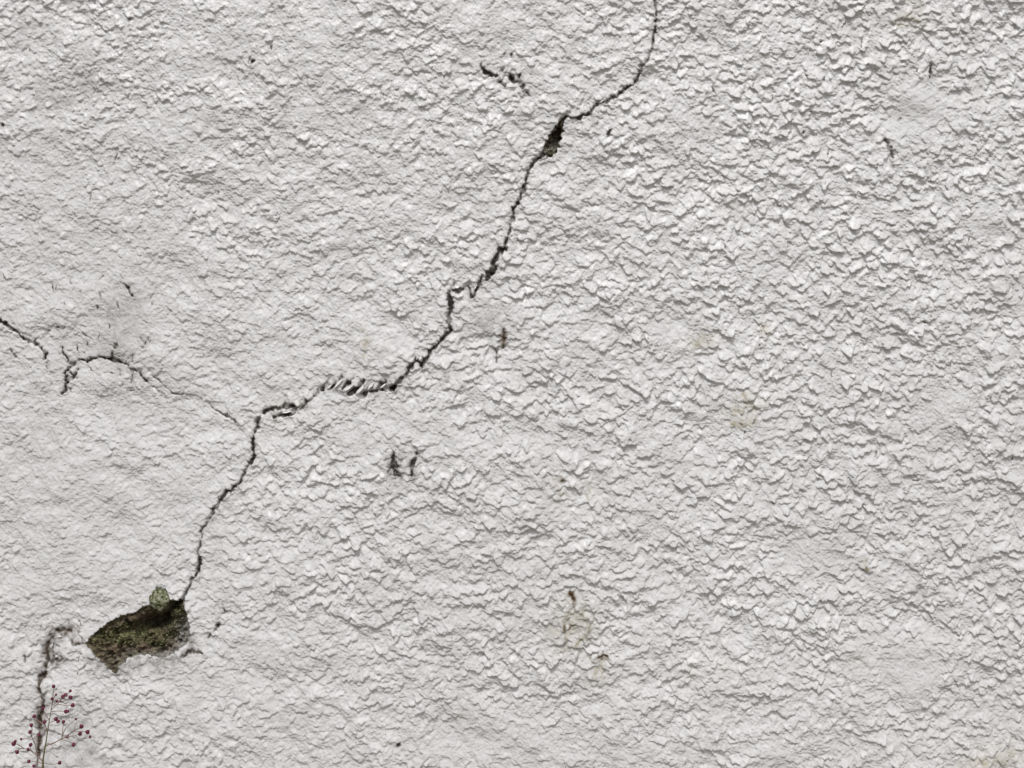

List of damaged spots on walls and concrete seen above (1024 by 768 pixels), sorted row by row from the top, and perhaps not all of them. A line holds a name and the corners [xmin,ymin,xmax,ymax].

crack [0,319,183,398]
crack [182,0,657,601]
crack [36,626,72,768]
spalling [71,586,191,676]